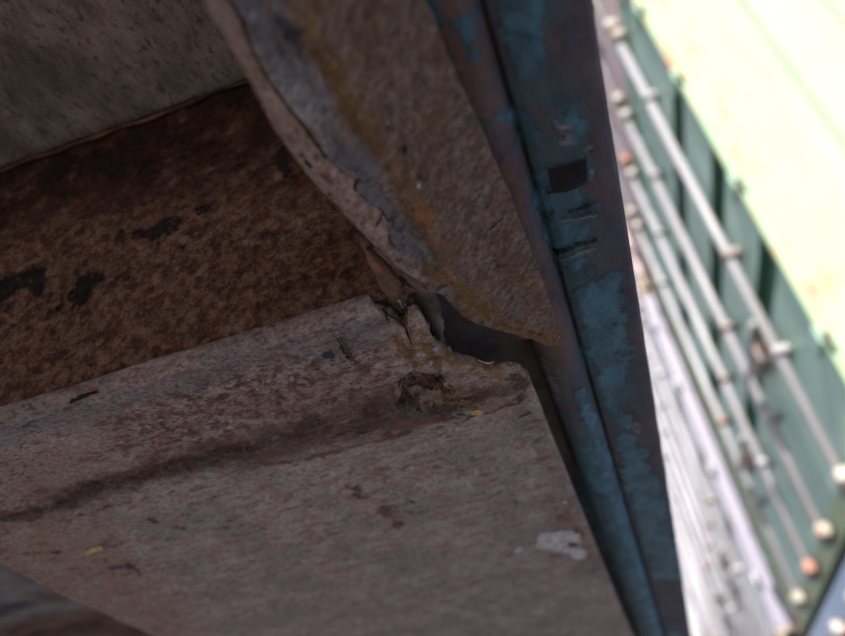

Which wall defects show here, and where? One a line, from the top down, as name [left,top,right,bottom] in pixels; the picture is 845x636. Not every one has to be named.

peeling [496,0,548,79]
damp [0,261,105,315]
crack [381,308,412,346]
rust [360,236,482,401]
spalling [392,372,455,412]